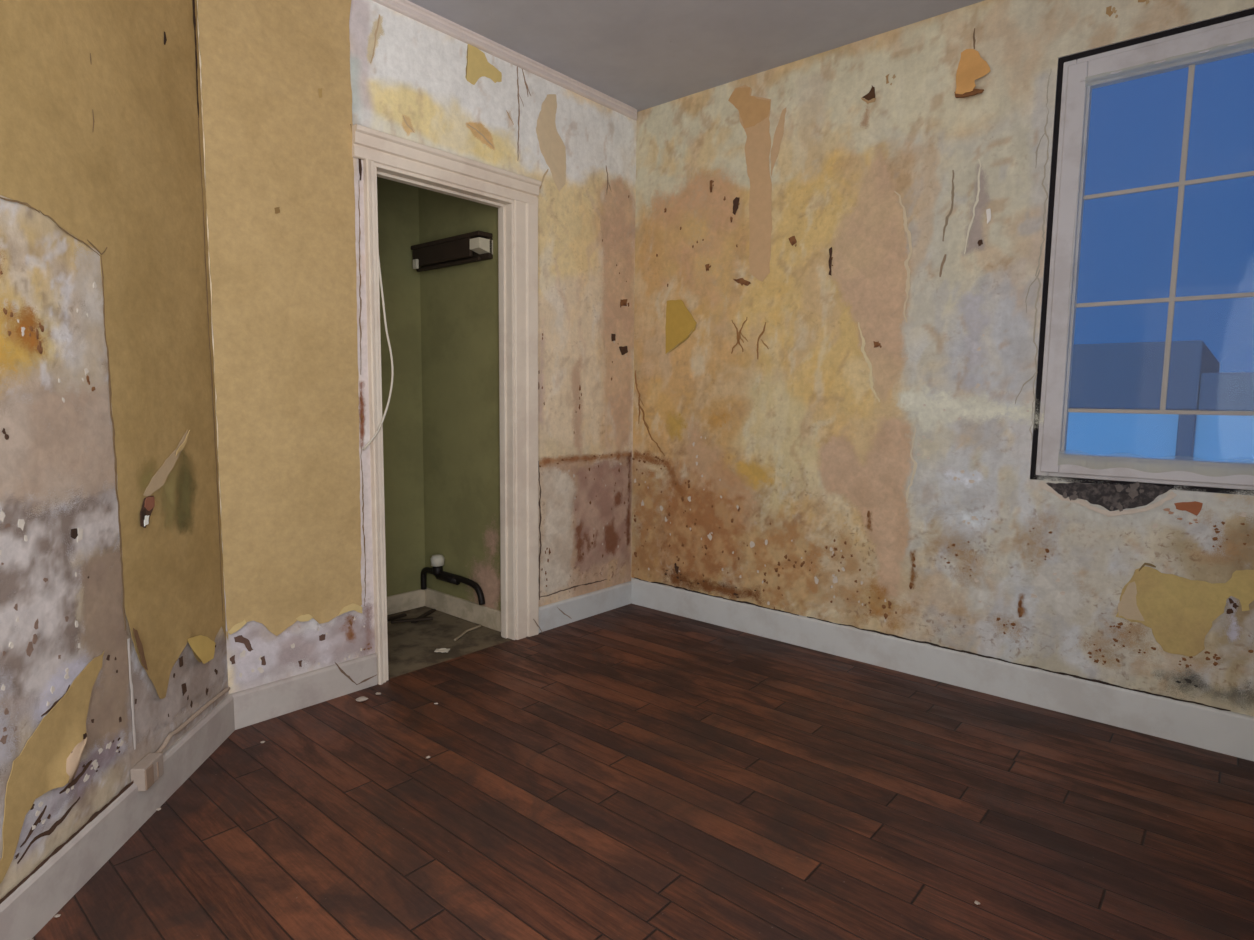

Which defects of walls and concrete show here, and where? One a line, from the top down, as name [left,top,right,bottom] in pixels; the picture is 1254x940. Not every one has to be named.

peeling [955,49,990,98]
flaking render [45,243,112,419]
spalling [1038,481,1203,524]
spalling [0,480,375,883]
leakage [1151,667,1254,715]